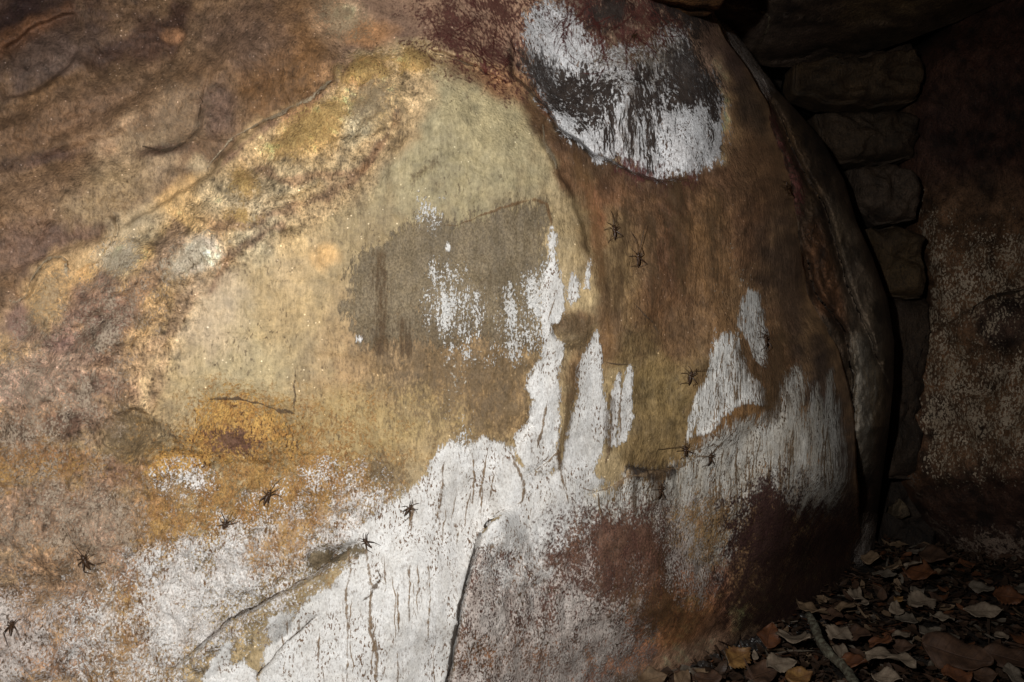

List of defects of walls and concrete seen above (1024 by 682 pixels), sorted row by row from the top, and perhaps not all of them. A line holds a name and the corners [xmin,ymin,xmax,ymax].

crack [445,451,561,682]